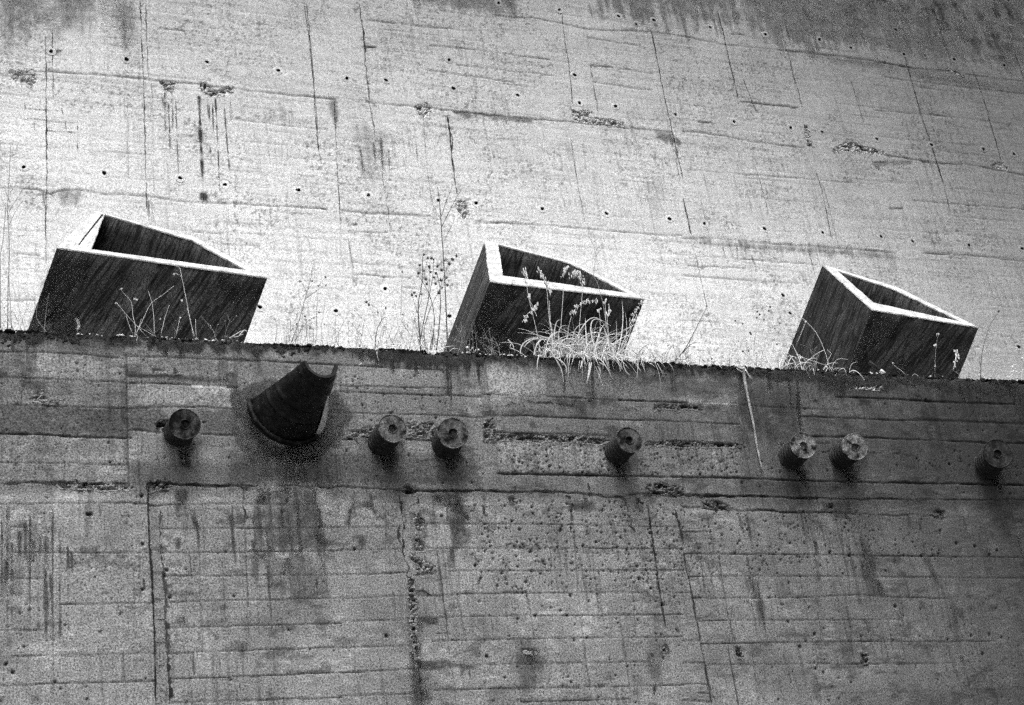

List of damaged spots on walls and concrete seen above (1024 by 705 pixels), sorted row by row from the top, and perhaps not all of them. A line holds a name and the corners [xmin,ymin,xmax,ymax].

spalling [197,81,235,97]
spalling [571,109,625,128]
damp [197,96,229,176]
spalling [833,141,886,156]
damp [230,378,352,597]